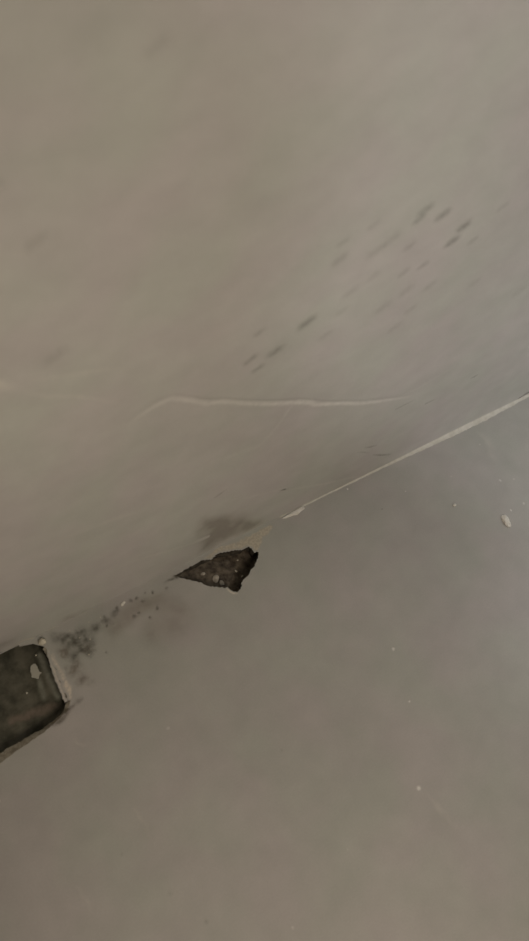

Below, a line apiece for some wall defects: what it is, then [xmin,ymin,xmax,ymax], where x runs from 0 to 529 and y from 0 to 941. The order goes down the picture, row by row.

spalling [175,506,305,595]
spalling [0,644,74,763]